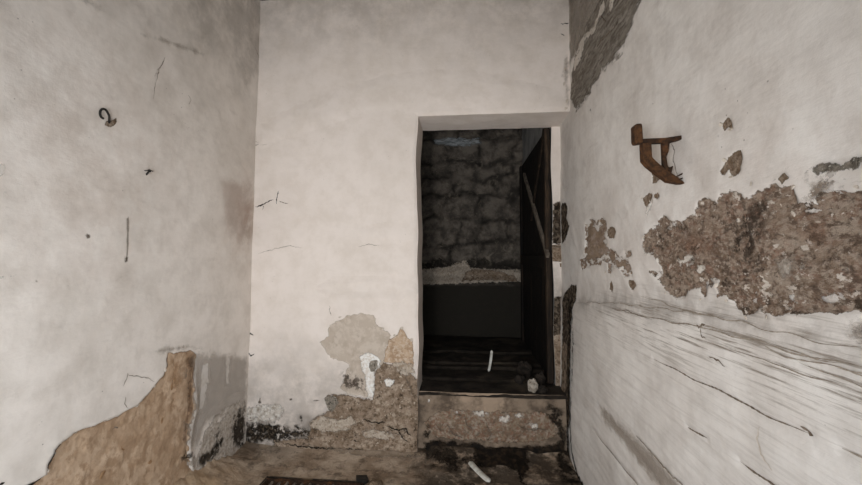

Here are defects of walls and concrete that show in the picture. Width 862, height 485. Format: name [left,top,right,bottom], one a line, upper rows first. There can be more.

peeling [570,0,641,112]
flaking render [719,117,733,131]
flaking render [720,150,742,178]
flaking render [580,218,636,292]
flaking render [641,173,862,320]
flaking render [29,350,197,485]
peeling [320,313,414,398]
damp [182,352,579,485]
flaking render [424,284,577,456]